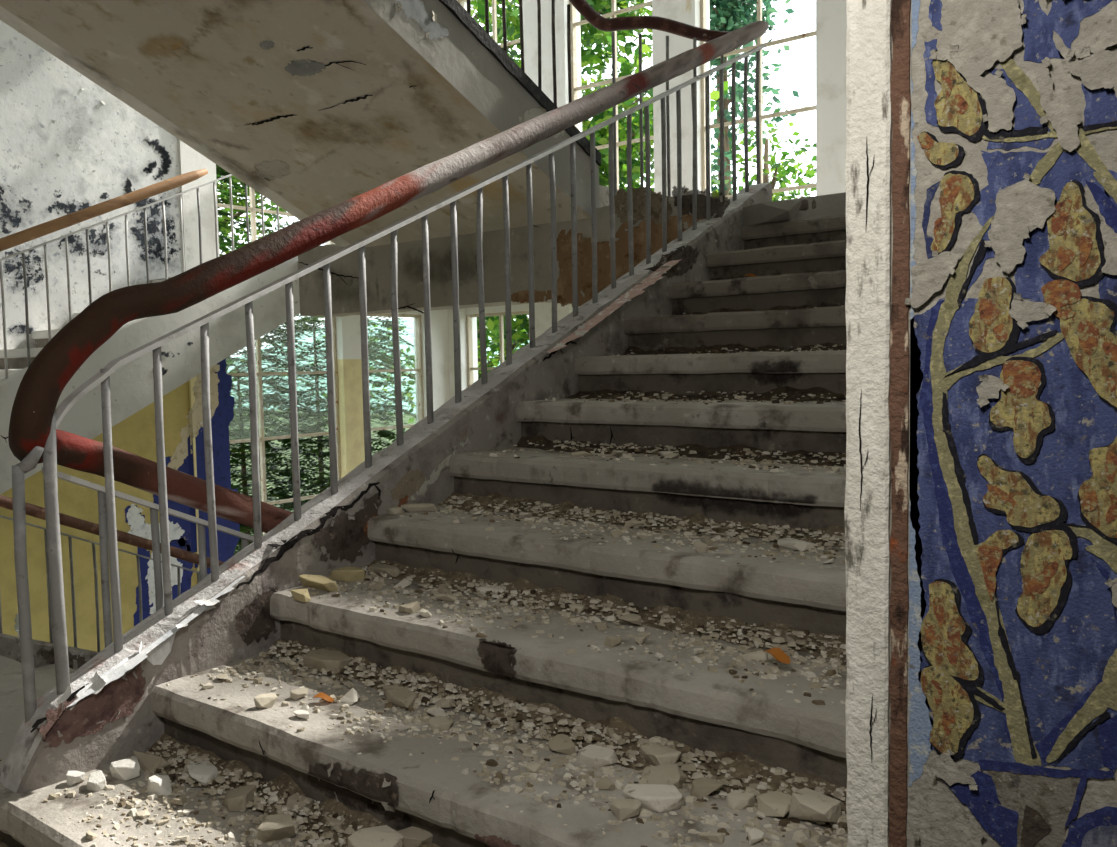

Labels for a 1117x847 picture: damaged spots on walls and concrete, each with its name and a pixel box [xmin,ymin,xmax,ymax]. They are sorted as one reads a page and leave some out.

crack [247,45,373,126]
peeling [929,0,1027,132]
peeling [1065,0,1117,97]
flaking render [511,186,730,353]
peeling [905,251,963,308]
peeling [984,173,1056,273]
peeling [1009,293,1057,329]
peeling [1100,221,1117,275]
peeling [127,504,185,615]
crack [236,482,381,589]
spalling [36,575,245,747]
spalling [308,759,405,821]